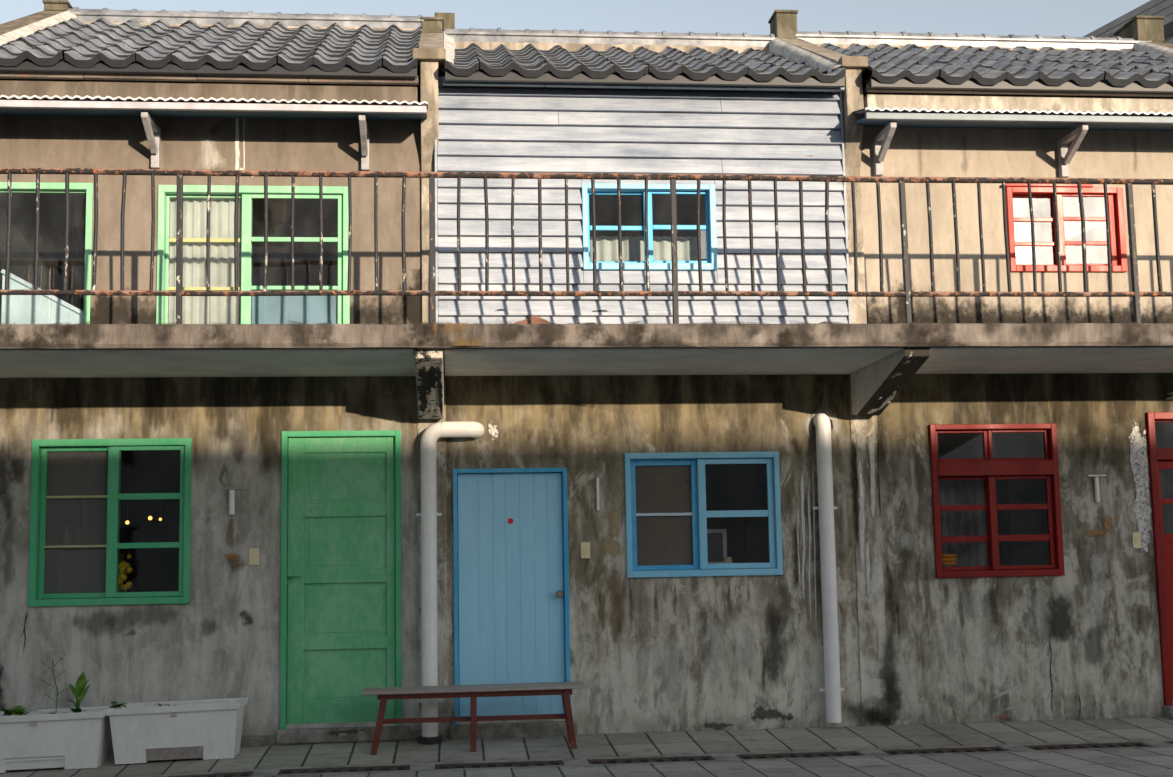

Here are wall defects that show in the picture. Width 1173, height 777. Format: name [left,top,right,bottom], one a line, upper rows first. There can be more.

damp [866,289,1173,345]
peeling [417,366,443,416]
peeling [869,391,896,414]
damp [1051,373,1090,435]
damp [0,446,23,583]
damp [852,435,881,597]
peeling [1129,421,1152,552]
damp [599,575,633,641]
damp [745,469,817,687]
damp [848,564,901,726]
damp [1034,587,1071,639]
damp [1086,629,1101,664]